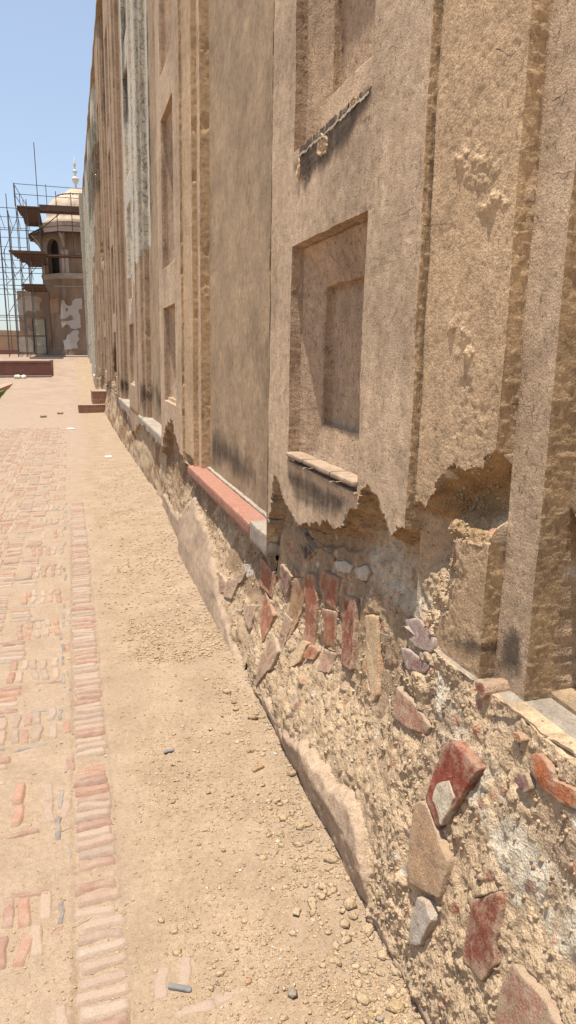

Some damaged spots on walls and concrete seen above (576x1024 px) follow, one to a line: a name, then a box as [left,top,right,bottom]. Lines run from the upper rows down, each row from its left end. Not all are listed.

peeling [49,298,82,350]
spalling [83,82,576,1024]